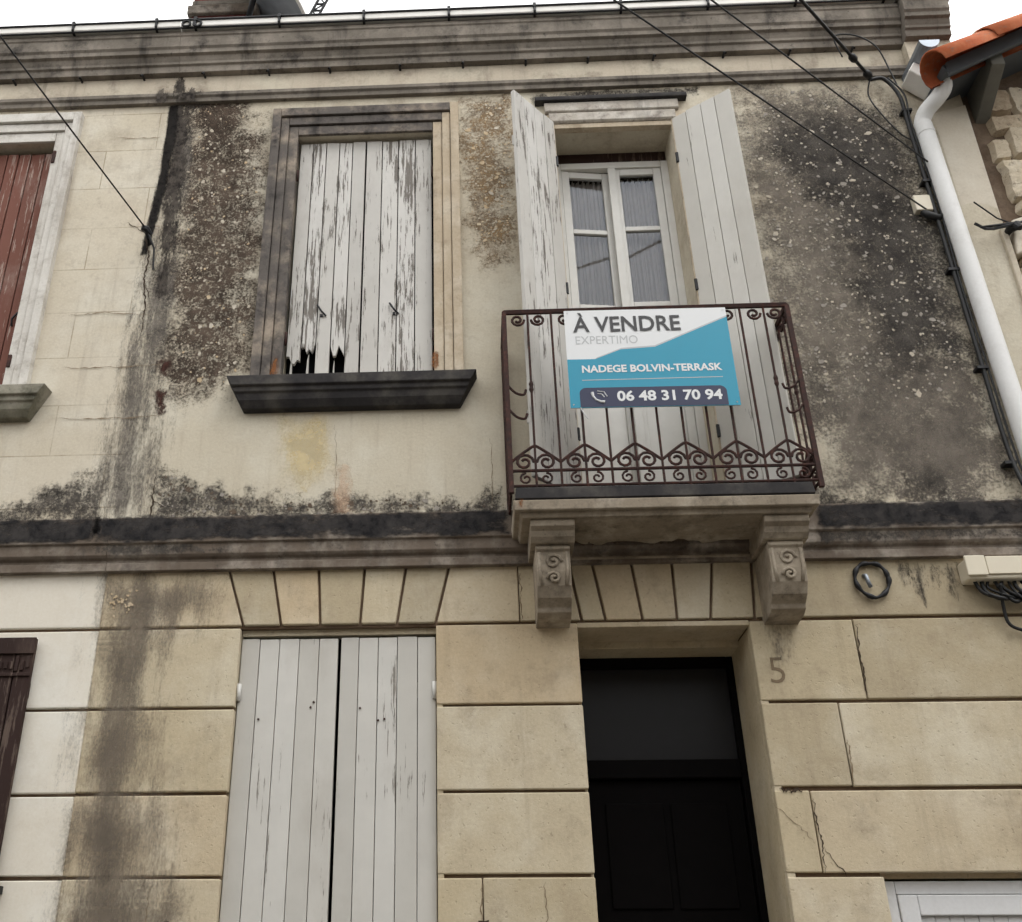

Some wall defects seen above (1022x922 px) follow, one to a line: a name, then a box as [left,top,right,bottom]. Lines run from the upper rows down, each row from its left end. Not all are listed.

water stain [0,77,509,555]
water stain [815,465,1022,543]
crack [855,625,867,695]
water stain [74,573,202,922]
crack [777,802,846,874]